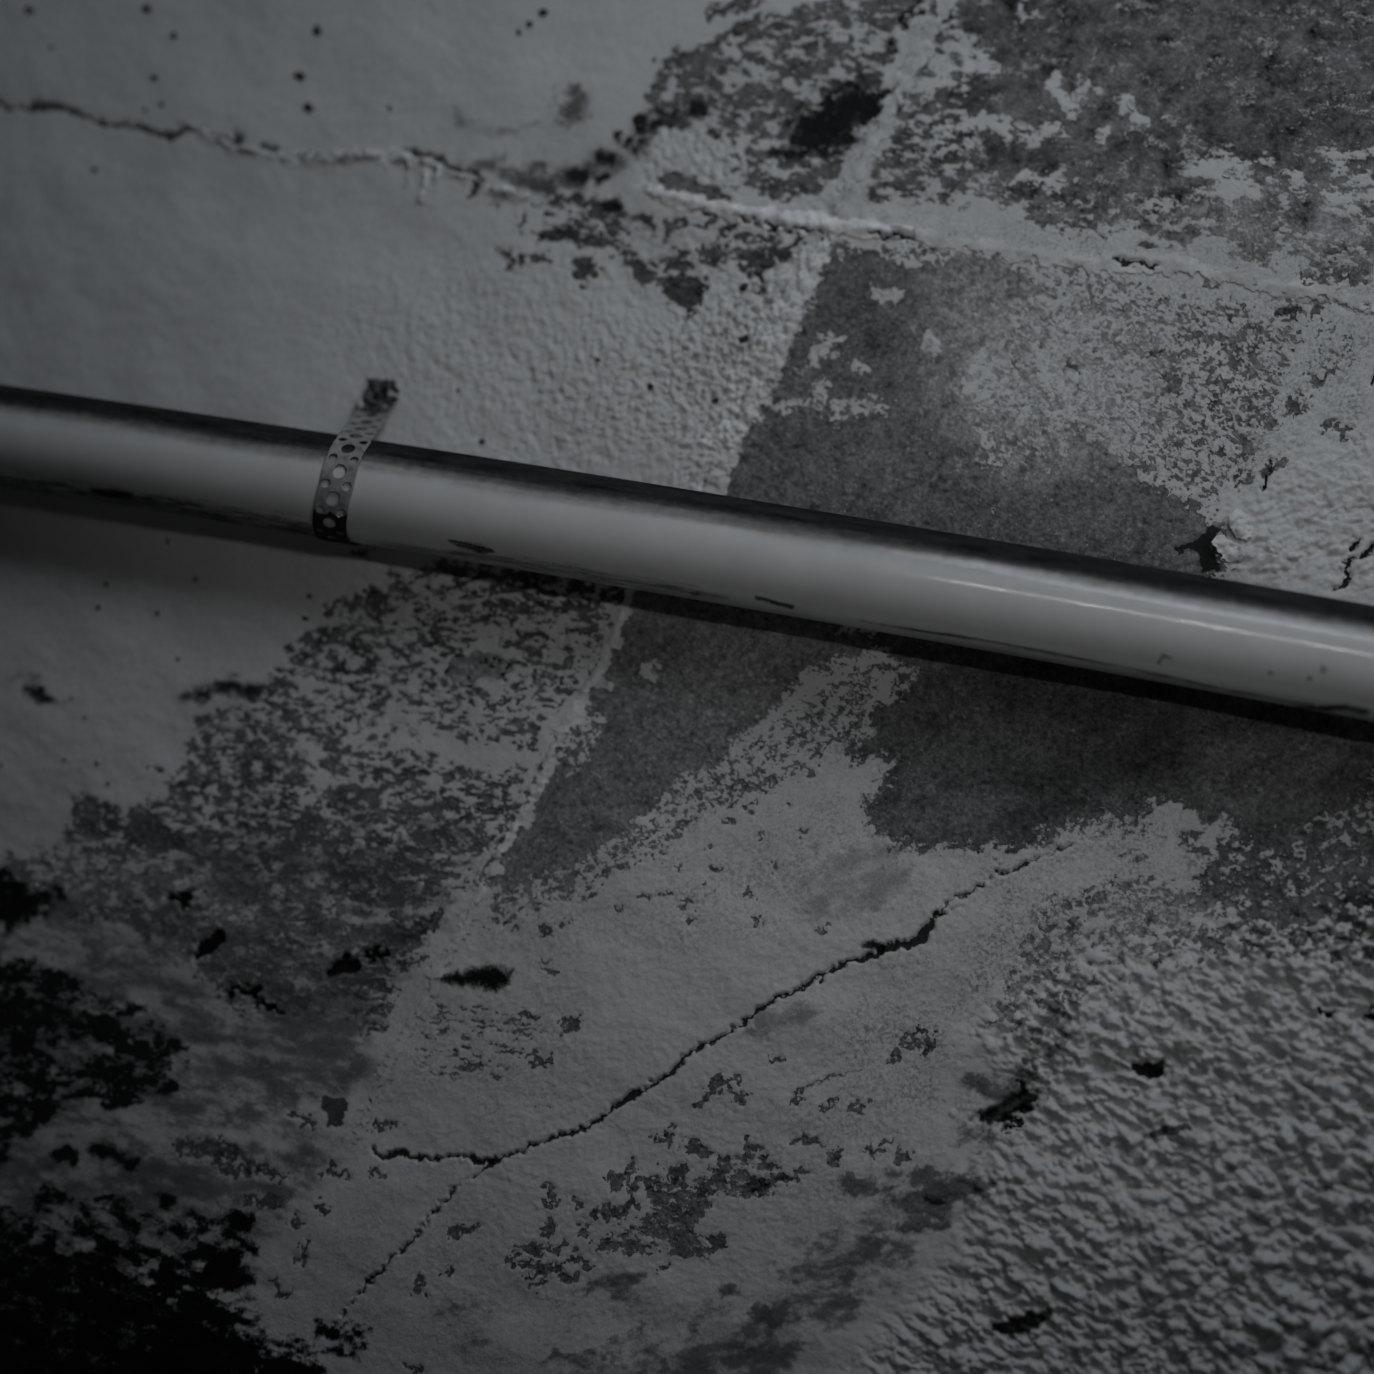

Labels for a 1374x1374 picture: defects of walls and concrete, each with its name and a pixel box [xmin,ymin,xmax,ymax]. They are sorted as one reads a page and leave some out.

crack [0,101,332,159]
peeling [496,0,1374,580]
crack [1260,459,1274,492]
crack [1333,538,1374,590]
peeling [2,558,889,1037]
water stain [0,864,67,935]
peeling [983,768,1374,1032]
water stain [0,956,190,1165]
water stain [49,1141,141,1171]
water stain [0,1180,373,1374]
peeling [505,1122,810,1294]
crack [337,844,1072,1325]